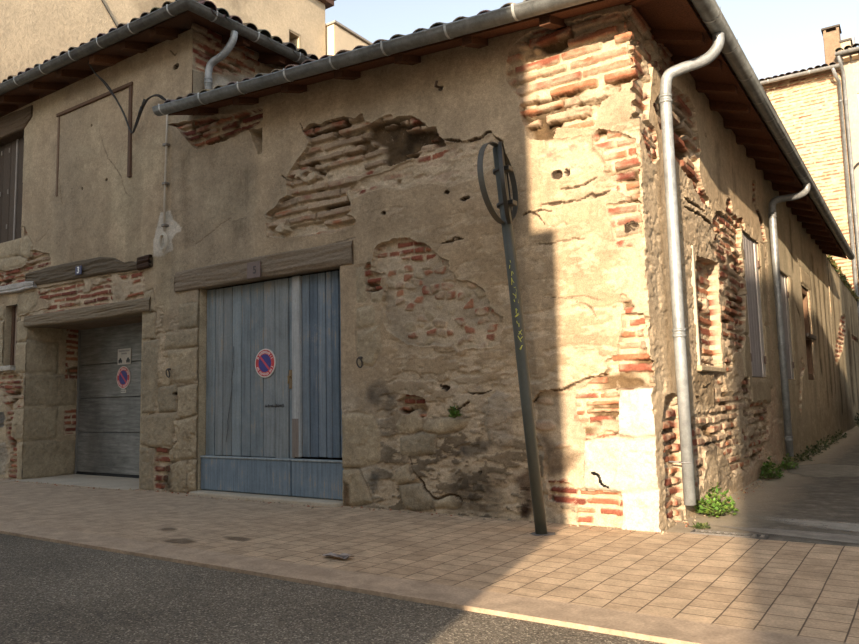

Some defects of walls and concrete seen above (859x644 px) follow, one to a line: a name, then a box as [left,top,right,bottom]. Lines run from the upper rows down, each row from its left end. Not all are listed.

spalling [168,106,263,149]
spalling [265,113,507,239]
crack [522,177,611,246]
spalling [0,249,51,286]
spalling [17,270,145,321]
peeling [364,237,504,352]
spalling [505,5,674,529]
spalling [671,85,770,489]
spalling [397,394,428,419]
crack [532,375,596,403]
crack [408,456,463,503]
spalling [661,393,686,524]